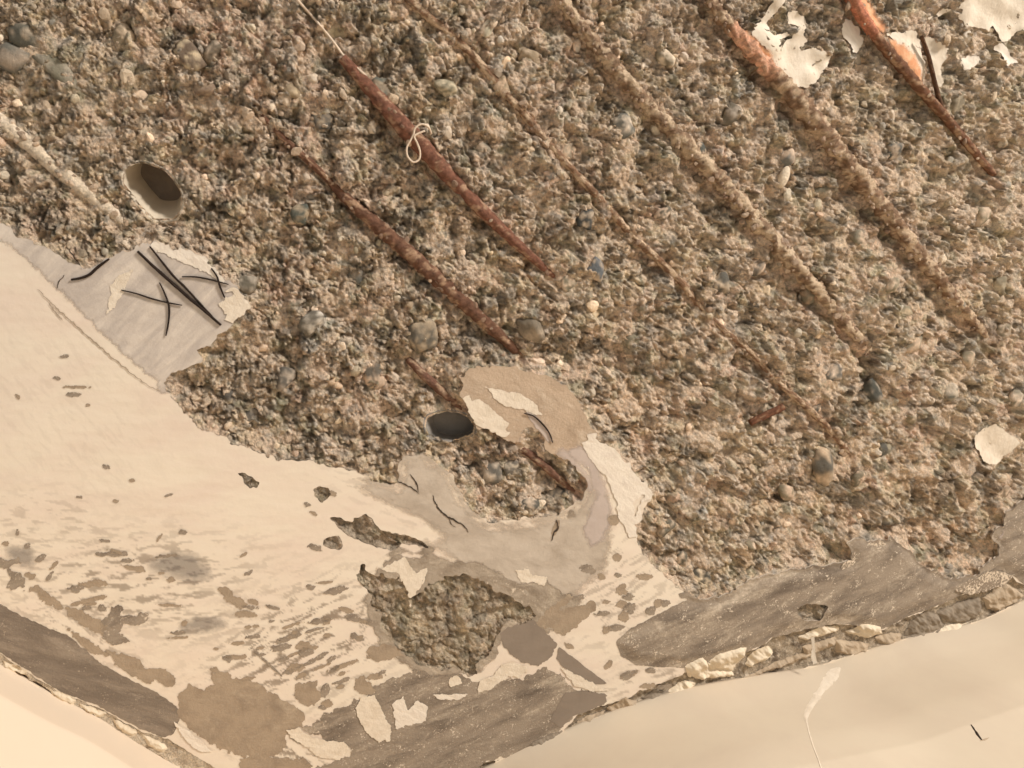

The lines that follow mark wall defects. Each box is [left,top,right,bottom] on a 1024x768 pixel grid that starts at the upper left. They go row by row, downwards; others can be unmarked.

corrosion [861,0,923,82]
crack [37,250,159,390]
spalling [0,0,1024,599]
peeling [0,500,1024,768]